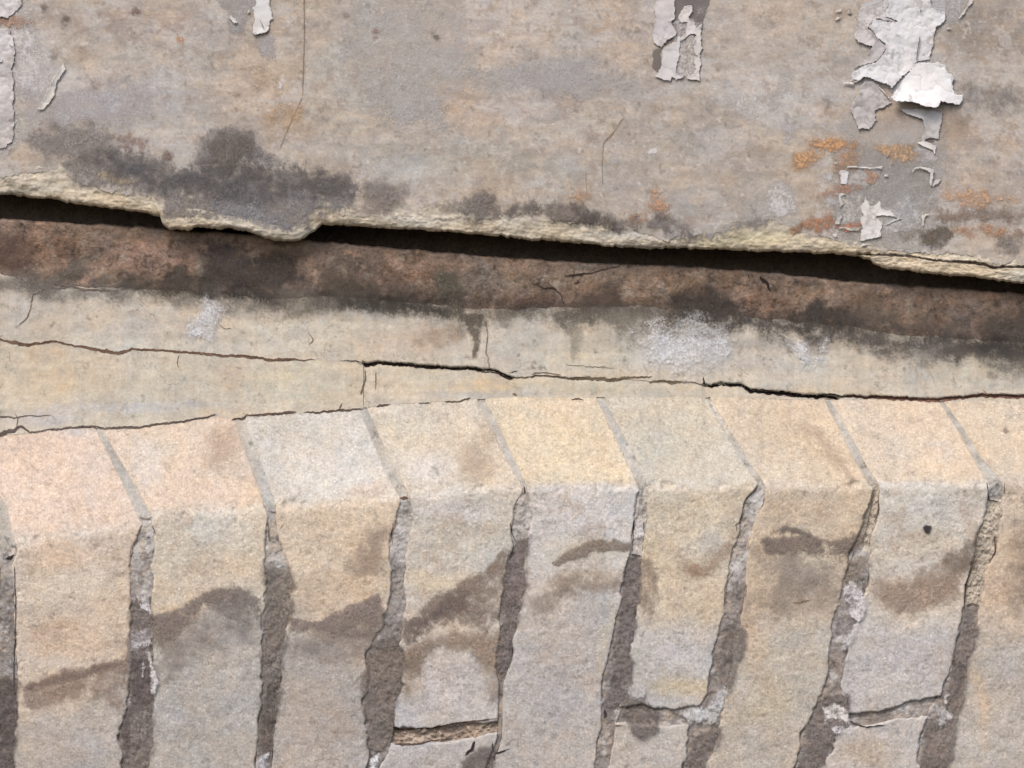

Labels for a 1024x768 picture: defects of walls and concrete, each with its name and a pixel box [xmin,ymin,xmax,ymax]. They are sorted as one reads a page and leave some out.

peeling [0,0,22,148]
peeling [652,0,709,81]
peeling [835,0,973,154]
water stain [25,120,407,231]
crack [531,264,621,304]
water stain [429,191,768,243]
rust [789,215,861,234]
rust [793,137,879,197]
crack [880,254,1024,269]
crack [0,319,1024,436]
water stain [760,525,980,650]
water stain [0,520,659,768]